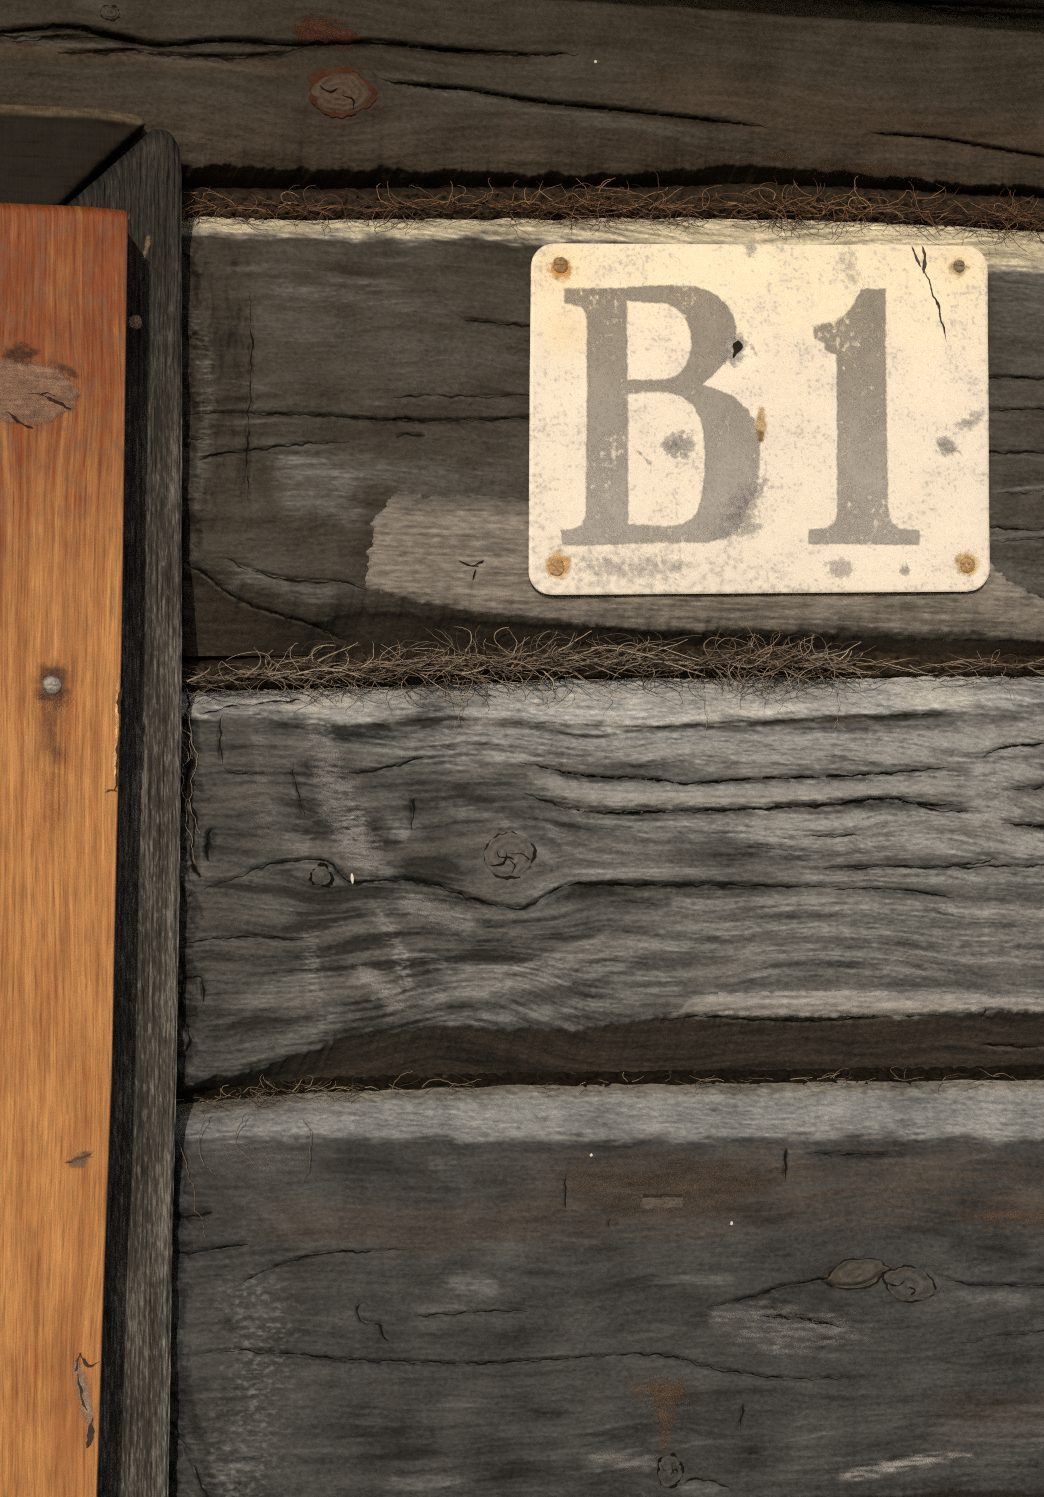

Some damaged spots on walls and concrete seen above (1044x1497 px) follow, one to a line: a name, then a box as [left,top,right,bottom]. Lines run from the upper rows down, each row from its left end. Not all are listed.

crack [912,246,947,342]
crack [180,695,1044,910]
crack [173,1164,407,1288]
crack [171,1302,863,1429]